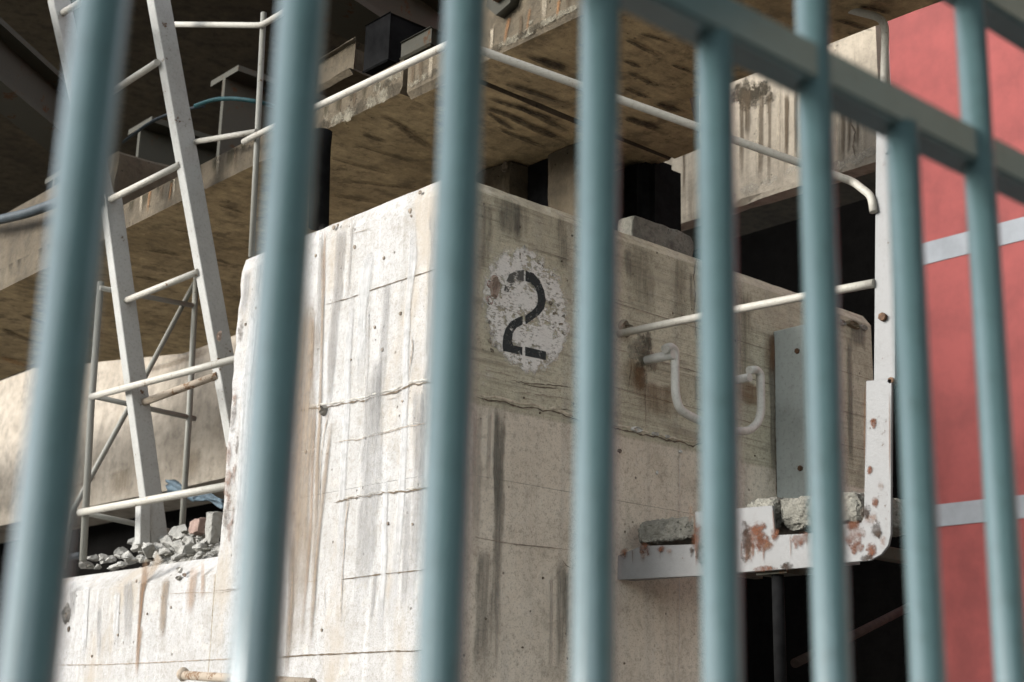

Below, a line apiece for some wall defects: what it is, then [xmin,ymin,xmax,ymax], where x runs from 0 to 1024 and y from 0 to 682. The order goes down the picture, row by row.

leakage [740,91,797,158]
spalling [486,275,500,306]
crack [478,370,574,419]
crack [617,428,699,447]
crack [309,338,428,621]
leakage [474,418,505,645]
rust [741,521,791,571]
rust [847,499,881,561]
rust [136,555,160,657]
rust [160,581,168,629]